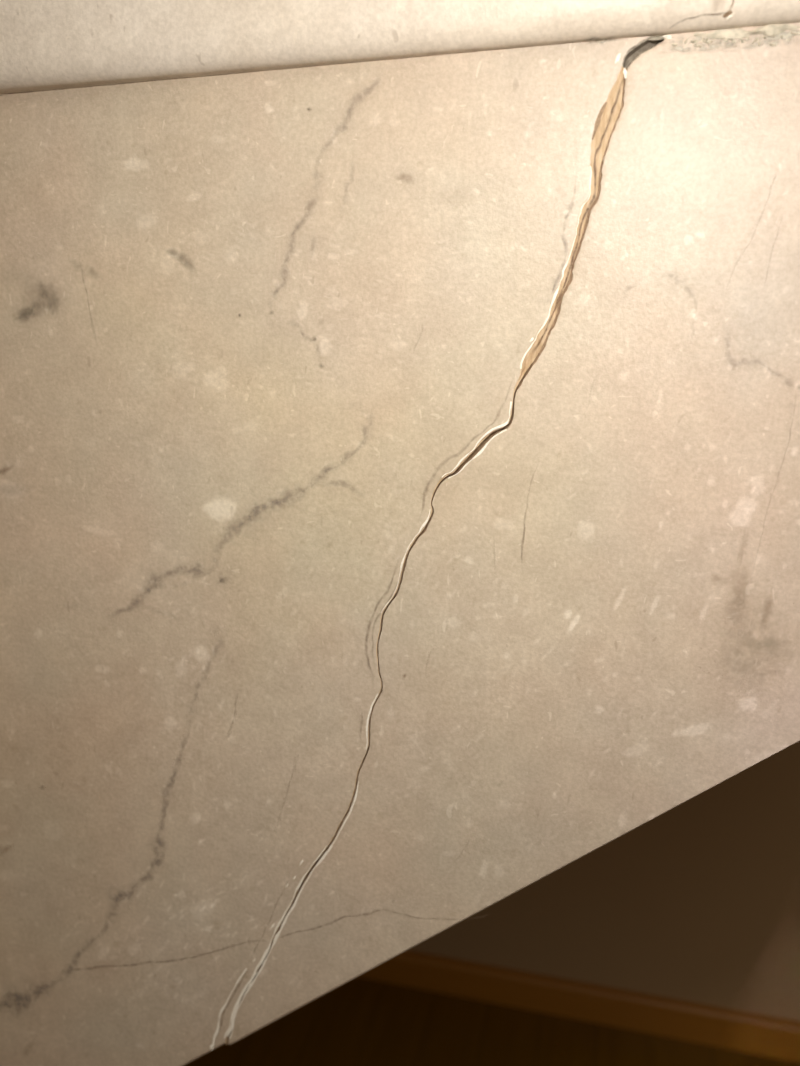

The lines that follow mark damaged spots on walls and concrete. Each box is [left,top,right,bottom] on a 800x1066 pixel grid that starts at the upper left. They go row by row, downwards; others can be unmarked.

crack [210,67,629,1051]